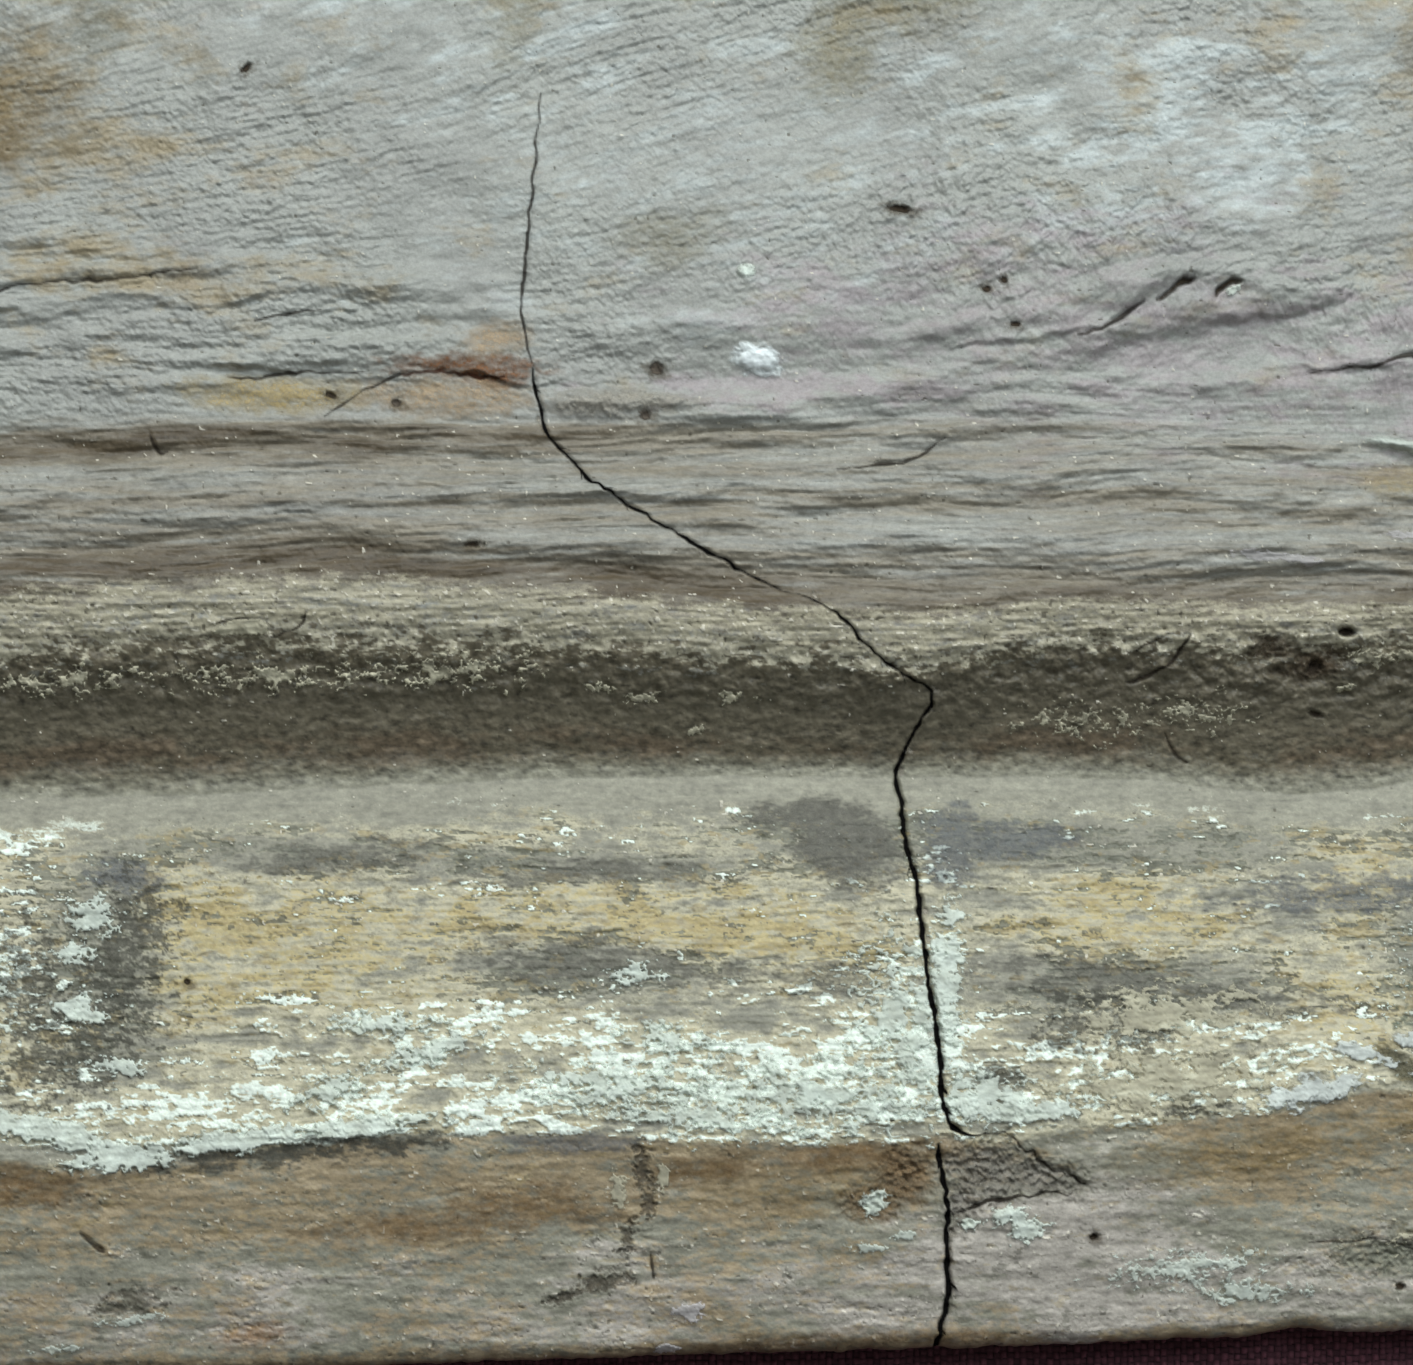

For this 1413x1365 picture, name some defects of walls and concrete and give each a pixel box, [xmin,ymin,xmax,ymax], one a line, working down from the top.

corrosion [376,330,532,412]
crack [218,612,306,637]
crack [233,105,1005,1346]
damp [750,800,905,891]
damp [930,802,1075,884]
damp [1239,871,1413,914]
damp [0,860,189,1115]
damp [1019,959,1175,1064]
damp [979,1064,1027,1083]
damp [1165,1103,1222,1118]
damp [155,1129,449,1177]